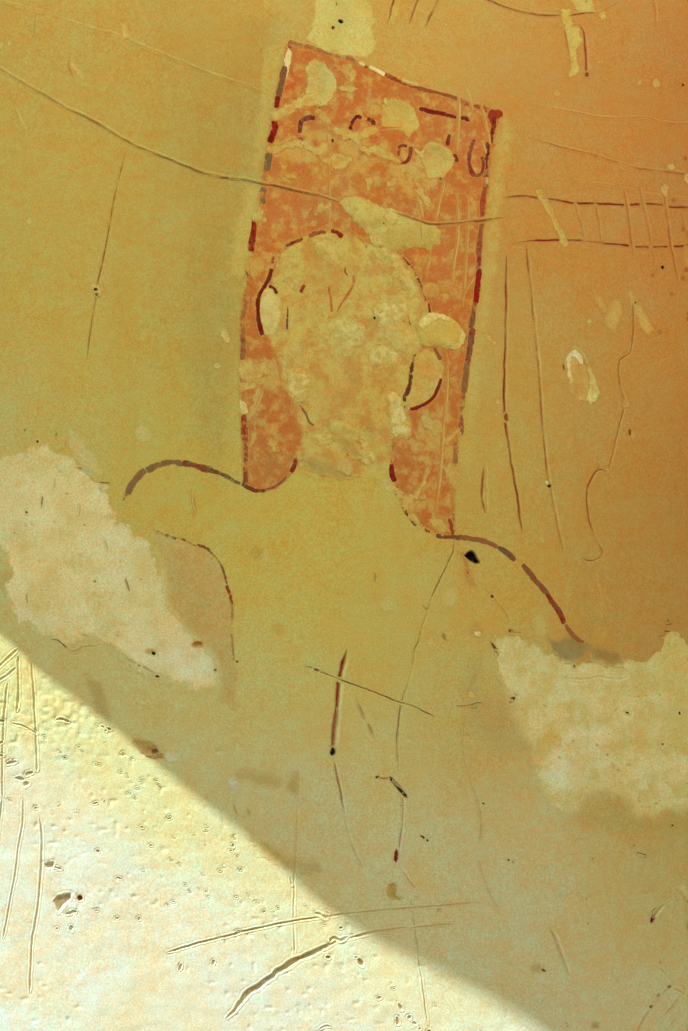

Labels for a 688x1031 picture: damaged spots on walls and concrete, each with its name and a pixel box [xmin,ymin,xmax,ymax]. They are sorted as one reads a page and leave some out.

crack [0,65,340,204]
peeling [265,0,456,208]
peeling [559,0,606,78]
crack [385,208,504,227]
spalling [561,345,601,405]
spalling [0,426,219,696]
spalling [491,627,688,813]